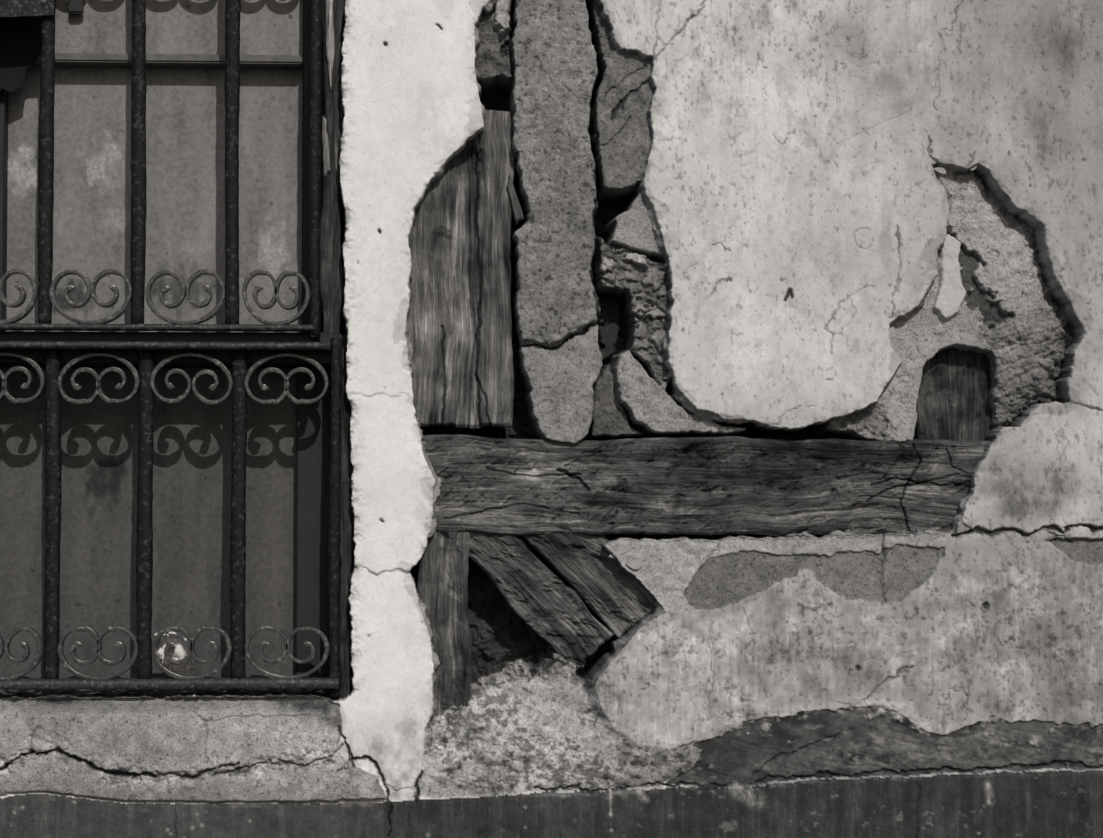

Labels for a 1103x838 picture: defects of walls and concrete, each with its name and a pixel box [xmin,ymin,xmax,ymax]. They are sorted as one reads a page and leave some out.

crack [494,0,517,58]
crack [516,0,708,351]
crack [683,243,733,301]
spalling [405,327,413,374]
spalling [412,0,1103,798]
crack [0,711,424,838]